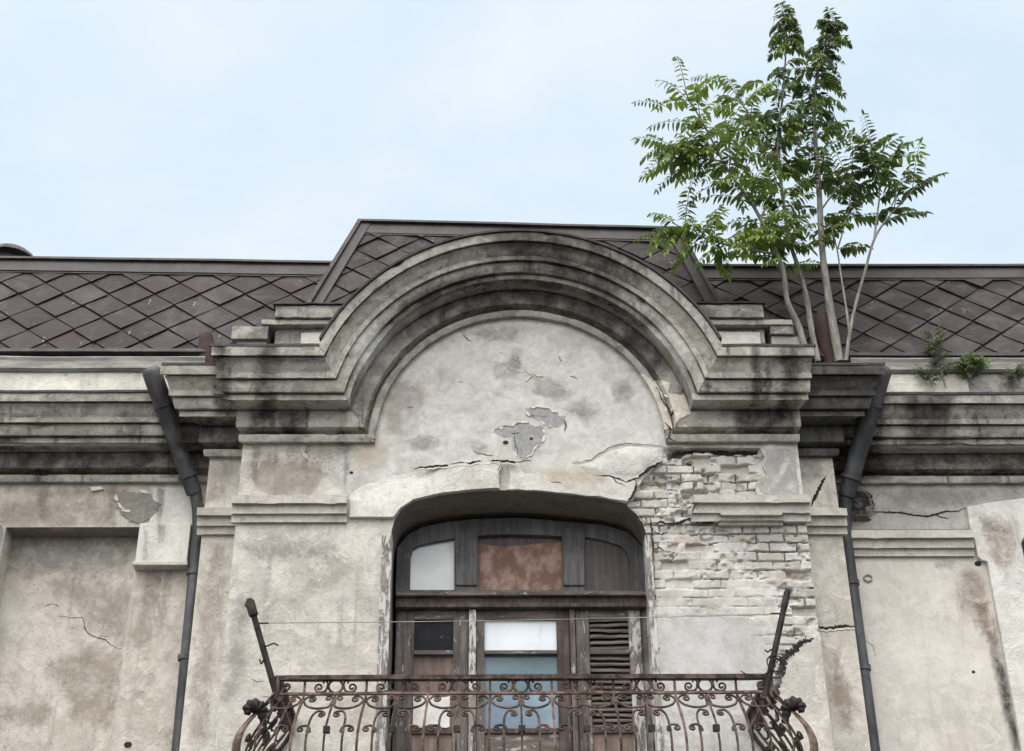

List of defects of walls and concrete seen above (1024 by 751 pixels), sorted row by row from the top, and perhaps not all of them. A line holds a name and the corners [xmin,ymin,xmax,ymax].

water stain [400,232,696,374]
peeling [90,486,162,523]
water stain [252,346,305,434]
crack [415,423,531,489]
peeling [495,405,565,460]
crack [583,443,663,500]
flaking render [627,387,819,658]
water stain [737,345,798,434]
crack [811,476,826,507]
crack [872,508,964,519]
crack [773,624,876,723]
water stain [996,657,1020,749]